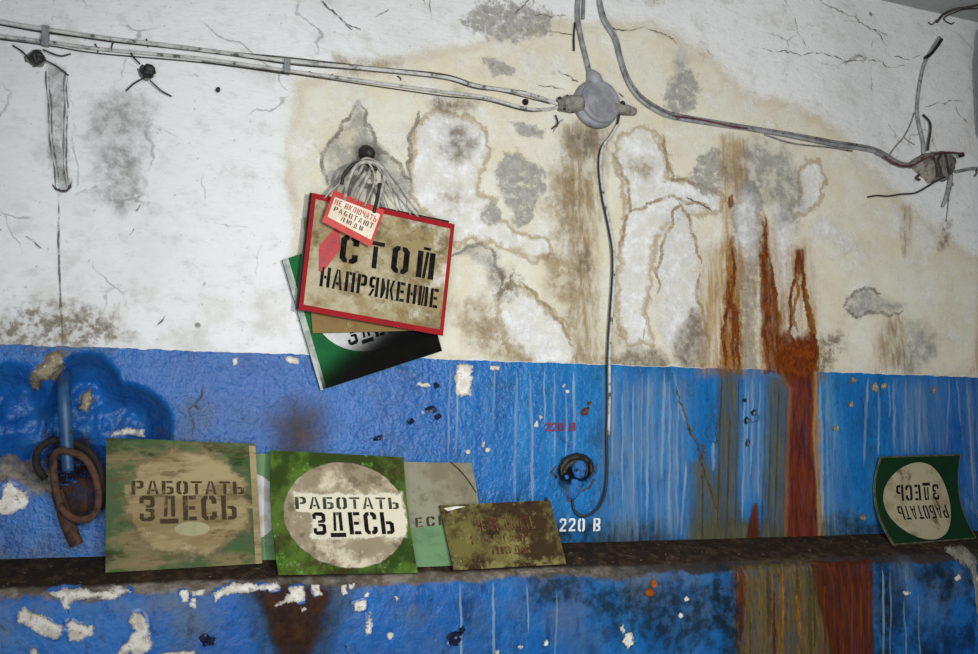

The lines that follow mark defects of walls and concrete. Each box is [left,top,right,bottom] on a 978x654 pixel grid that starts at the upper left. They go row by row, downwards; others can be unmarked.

crack [321,0,361,30]
crack [763,4,919,68]
leakage [288,22,978,376]
rust [722,144,741,222]
peeling [26,348,65,390]
rust [692,217,824,539]
flaking render [0,454,52,515]
peeling [17,584,134,644]
peeling [118,608,156,654]
peeling [177,580,323,612]
peeling [341,583,373,636]
rust [732,560,874,654]